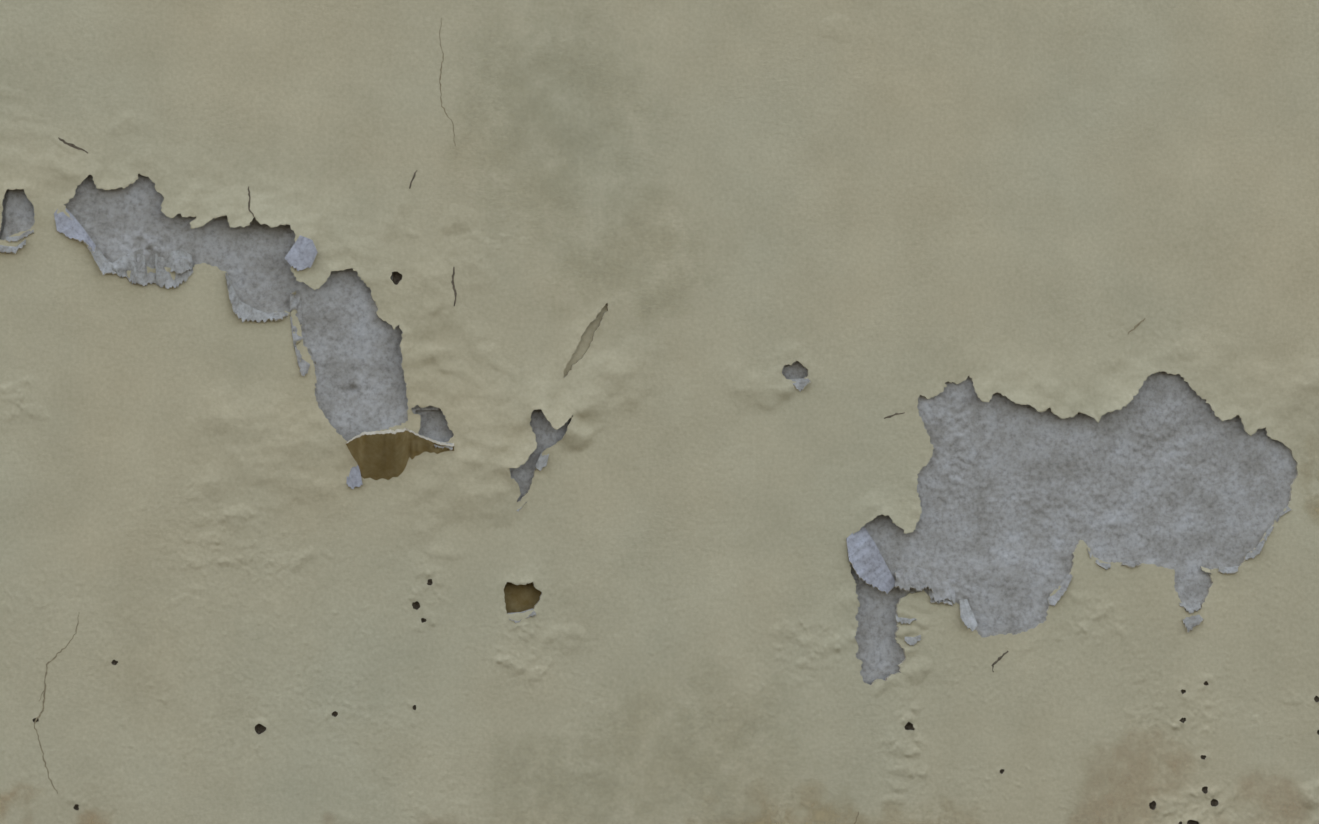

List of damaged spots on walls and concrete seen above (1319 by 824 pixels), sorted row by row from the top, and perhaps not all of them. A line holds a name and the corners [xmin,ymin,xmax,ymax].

peeling [0,106,638,529]
spalling [472,560,598,688]
peeling [715,339,826,414]
peeling [821,308,1319,685]